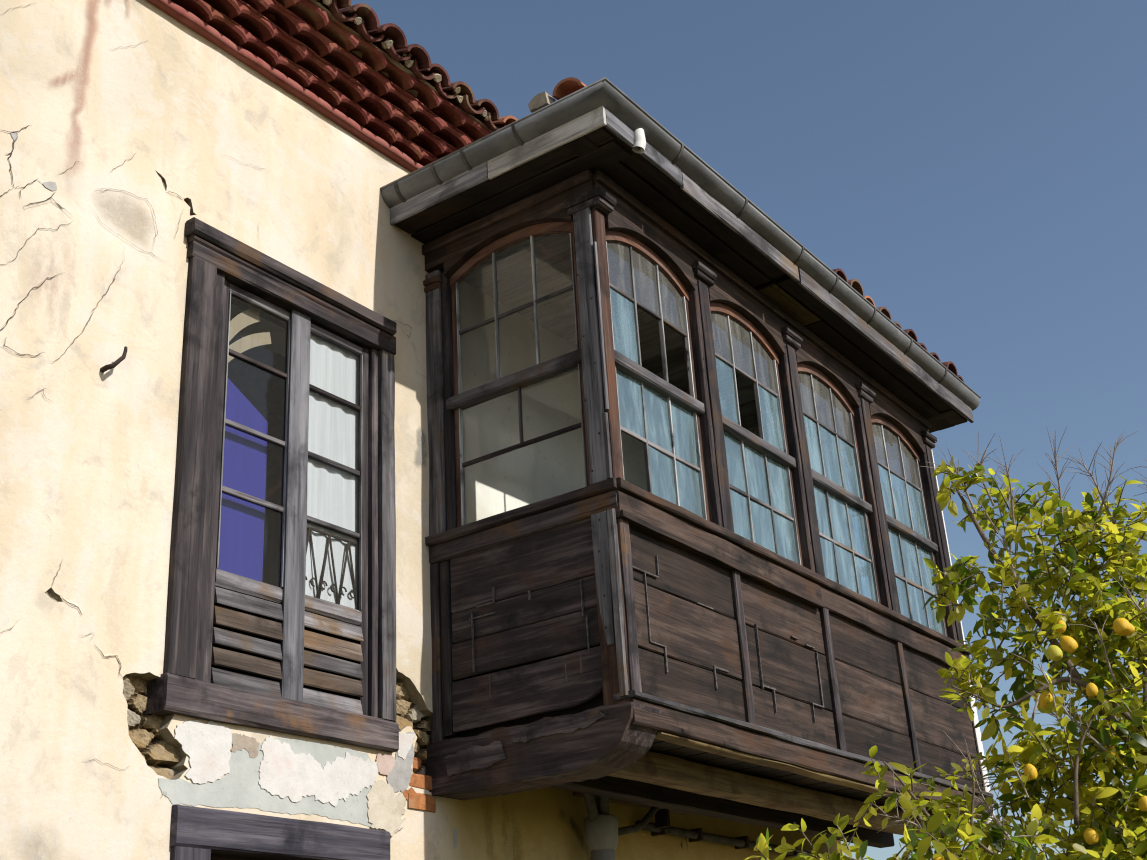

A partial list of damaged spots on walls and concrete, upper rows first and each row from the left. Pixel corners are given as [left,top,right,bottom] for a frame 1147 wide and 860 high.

crack [0,125,79,265]
crack [0,153,185,361]
crack [52,560,124,677]
flaking render [123,668,436,827]